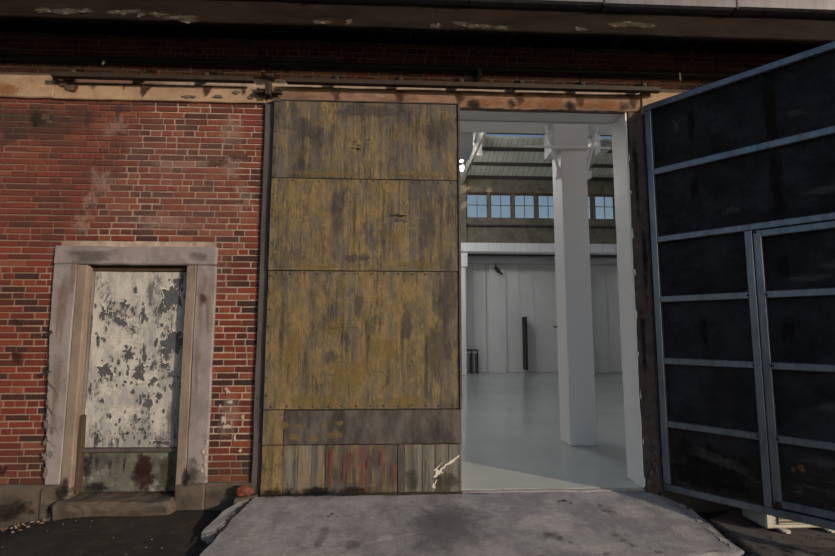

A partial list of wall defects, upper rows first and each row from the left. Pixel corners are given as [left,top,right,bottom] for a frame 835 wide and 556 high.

peeling [88,272,186,448]